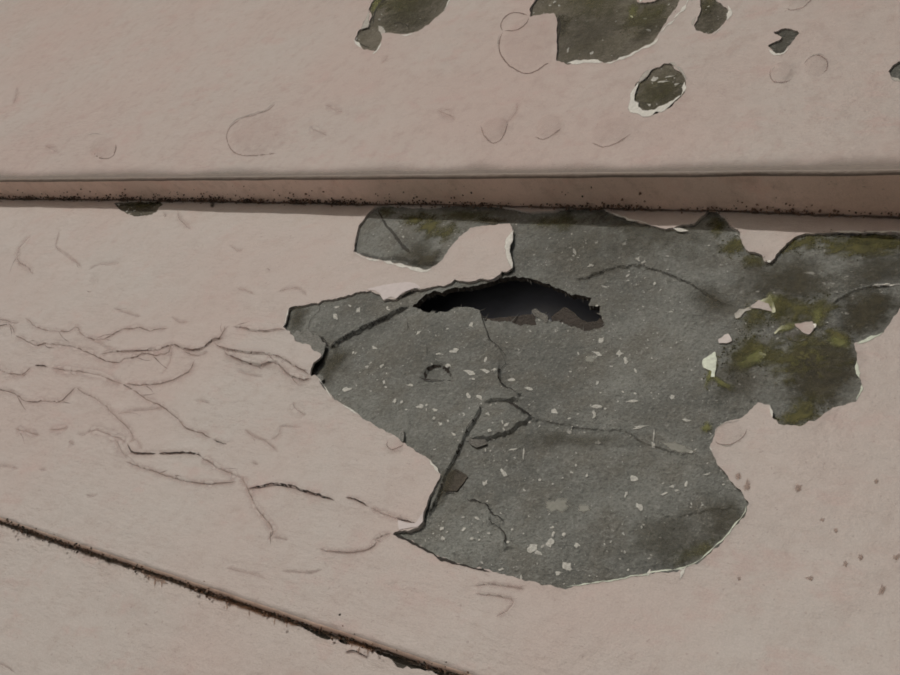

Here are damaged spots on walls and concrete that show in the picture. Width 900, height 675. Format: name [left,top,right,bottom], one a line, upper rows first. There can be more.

peeling [354,0,450,54]
peeling [498,0,732,74]
peeling [769,30,799,55]
peeling [628,62,686,117]
peeling [889,63,900,82]
crack [0,324,309,403]
crack [123,384,224,455]
peeling [284,206,900,589]
crack [249,483,365,504]